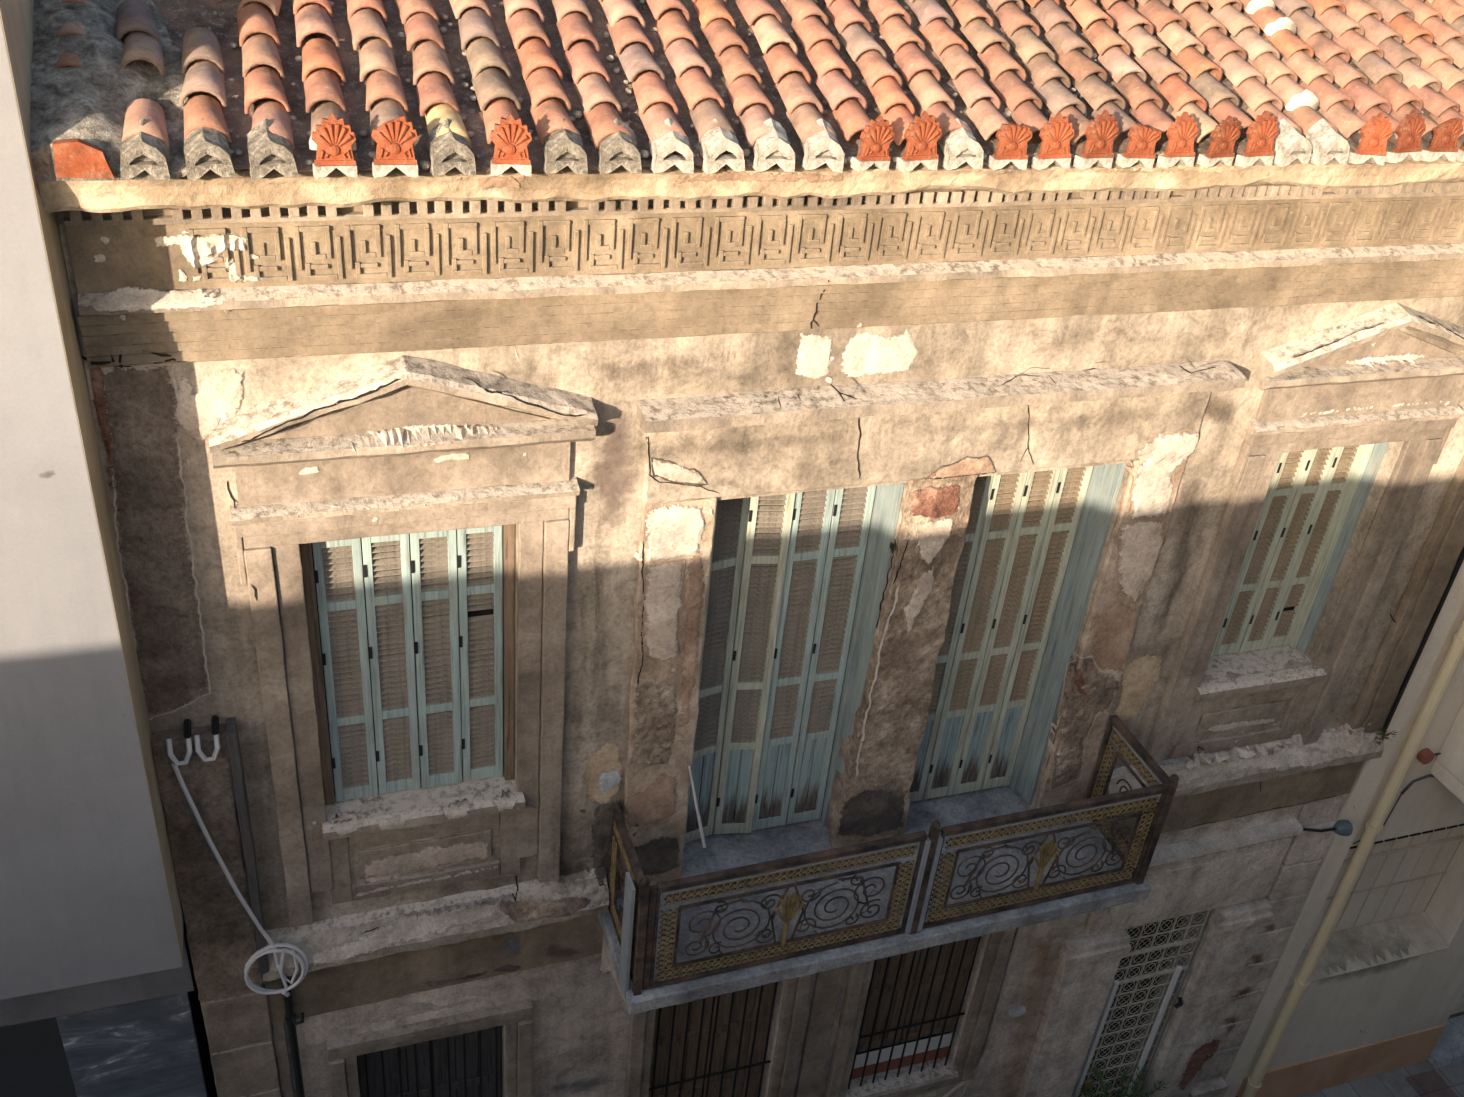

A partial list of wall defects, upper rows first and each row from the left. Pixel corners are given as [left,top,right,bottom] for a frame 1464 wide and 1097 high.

peeling [90,230,263,321]
crack [810,275,829,329]
crack [463,350,584,417]
peeling [795,322,919,383]
peeling [651,447,708,486]
spalling [902,455,997,634]
peeling [629,504,713,765]
spalling [1048,429,1199,791]